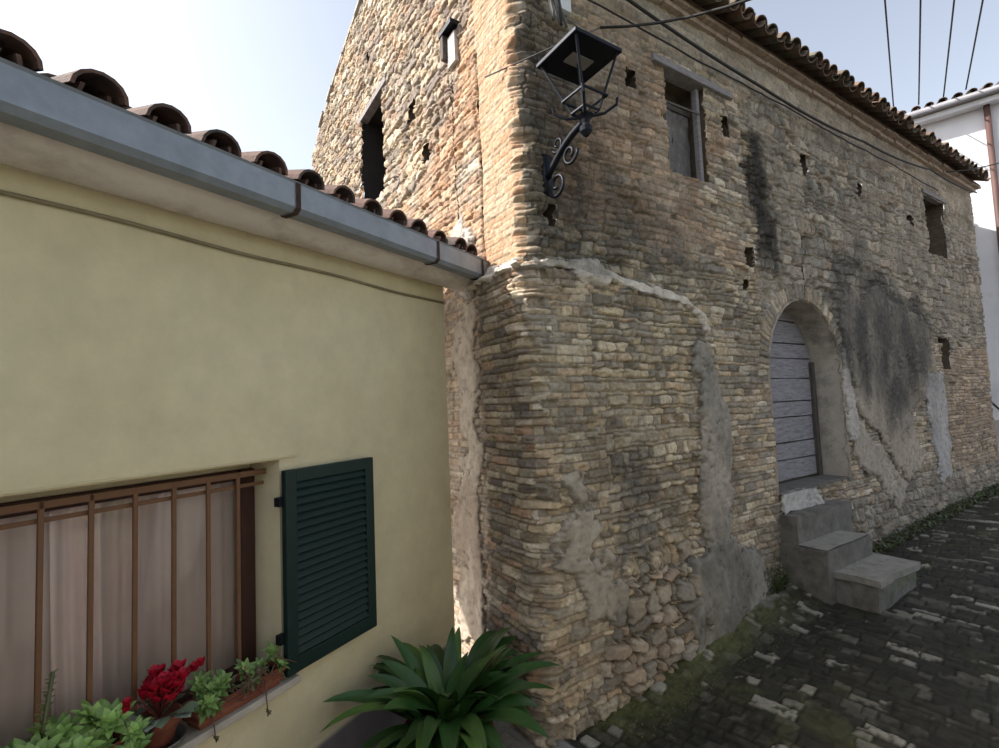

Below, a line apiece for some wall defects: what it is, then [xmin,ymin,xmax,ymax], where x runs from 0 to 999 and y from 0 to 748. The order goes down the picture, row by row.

peeling [450,213,474,244]
spalling [743,247,756,267]
water stain [740,134,779,267]
peeling [839,284,953,510]
spalling [450,257,777,697]